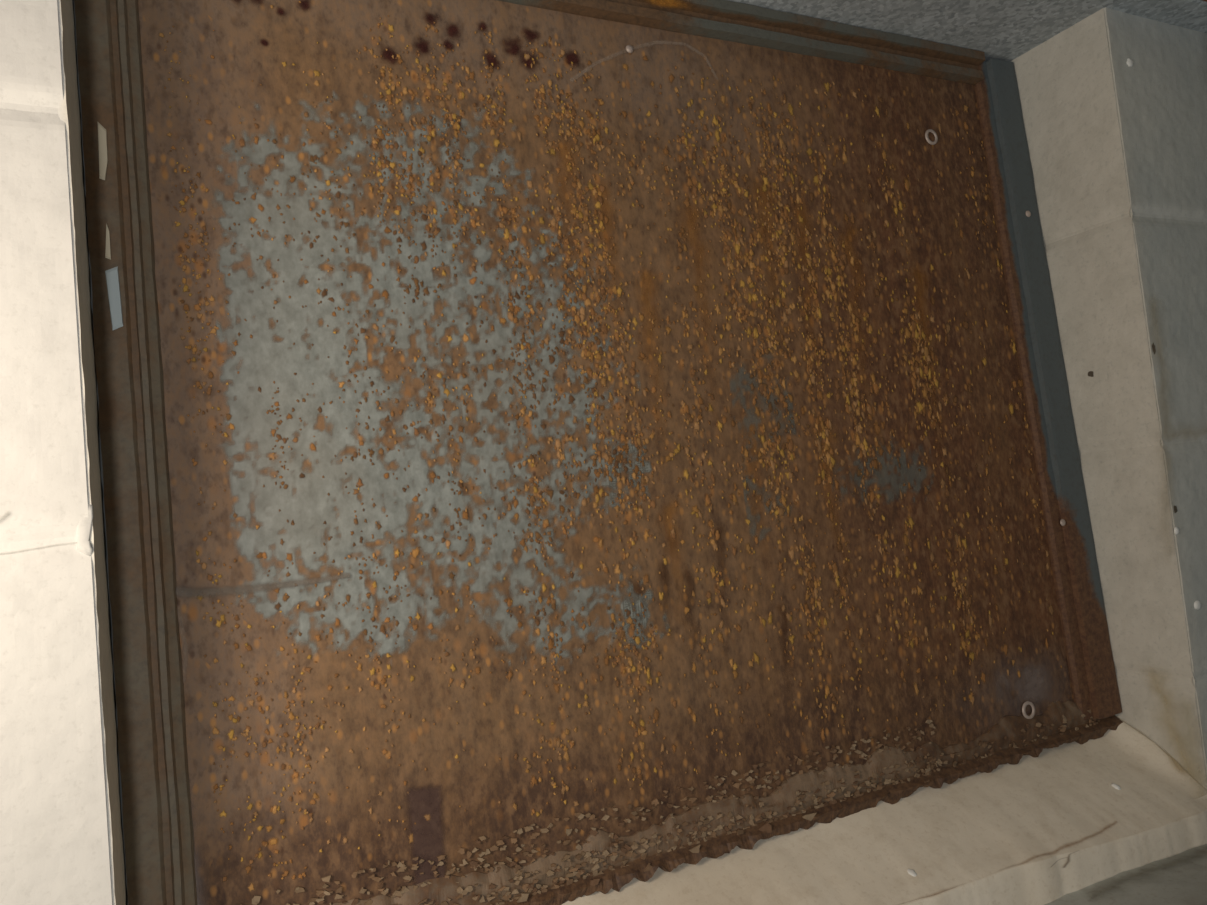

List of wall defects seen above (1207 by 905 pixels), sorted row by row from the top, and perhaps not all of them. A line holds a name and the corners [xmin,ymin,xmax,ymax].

corrosion [167,132,252,447]
peeling [215,102,652,663]
corrosion [196,14,1100,905]